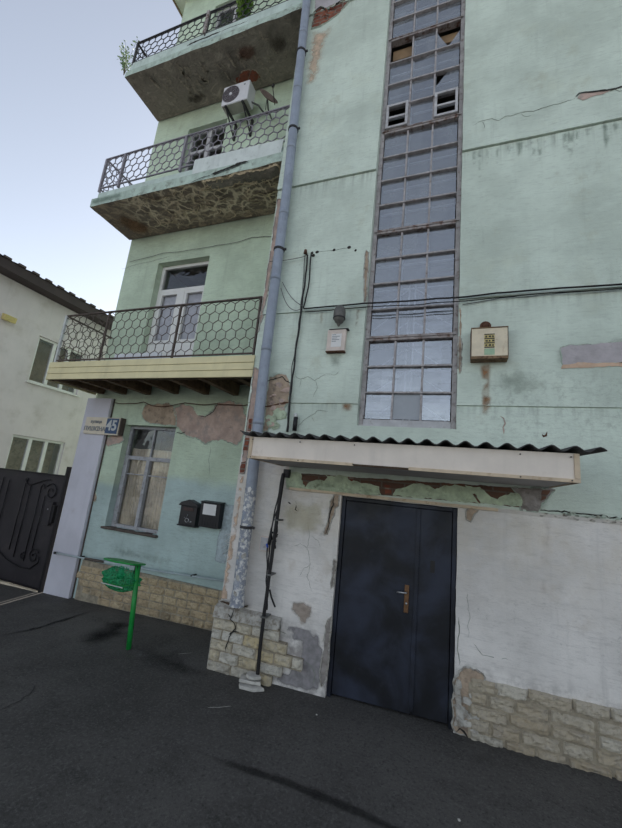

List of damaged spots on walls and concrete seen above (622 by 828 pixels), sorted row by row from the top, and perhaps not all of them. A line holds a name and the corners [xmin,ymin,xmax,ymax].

spalling [310,0,350,81]
crack [476,86,622,128]
peeling [560,341,622,369]
spalling [142,367,259,474]
spalling [263,373,291,432]
peeling [285,472,622,535]
crack [225,610,237,651]
peeling [293,603,311,623]
spalling [319,616,332,687]
spalling [451,666,486,737]